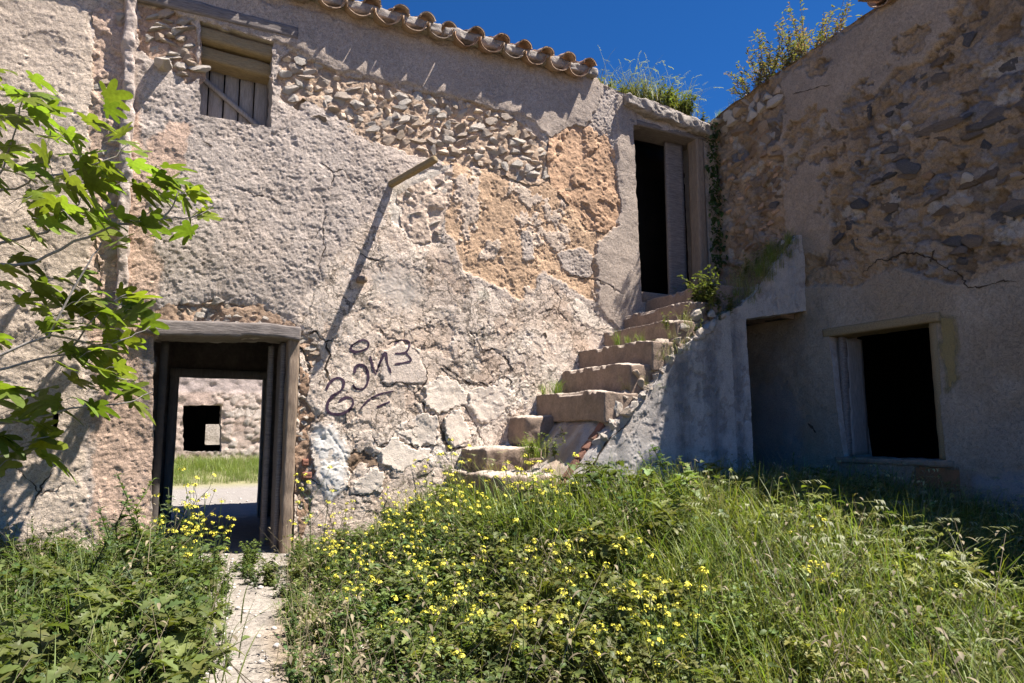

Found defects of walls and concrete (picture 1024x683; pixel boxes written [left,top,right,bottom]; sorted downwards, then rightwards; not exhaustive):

flaking render [269,52,621,245]
peeling [711,84,784,134]
flaking render [825,87,1024,267]
crack [863,250,1019,289]
flaking render [154,296,511,539]